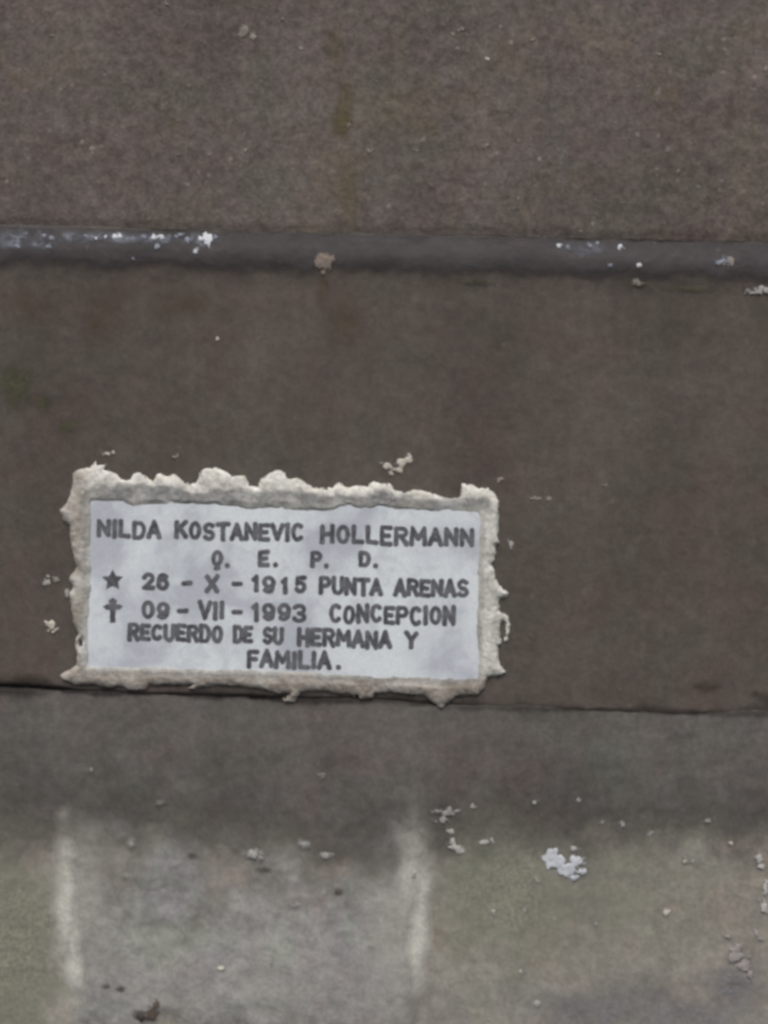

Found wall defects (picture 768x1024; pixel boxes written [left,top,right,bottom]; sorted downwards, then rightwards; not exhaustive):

damp [54,839,84,989]
damp [400,835,431,986]